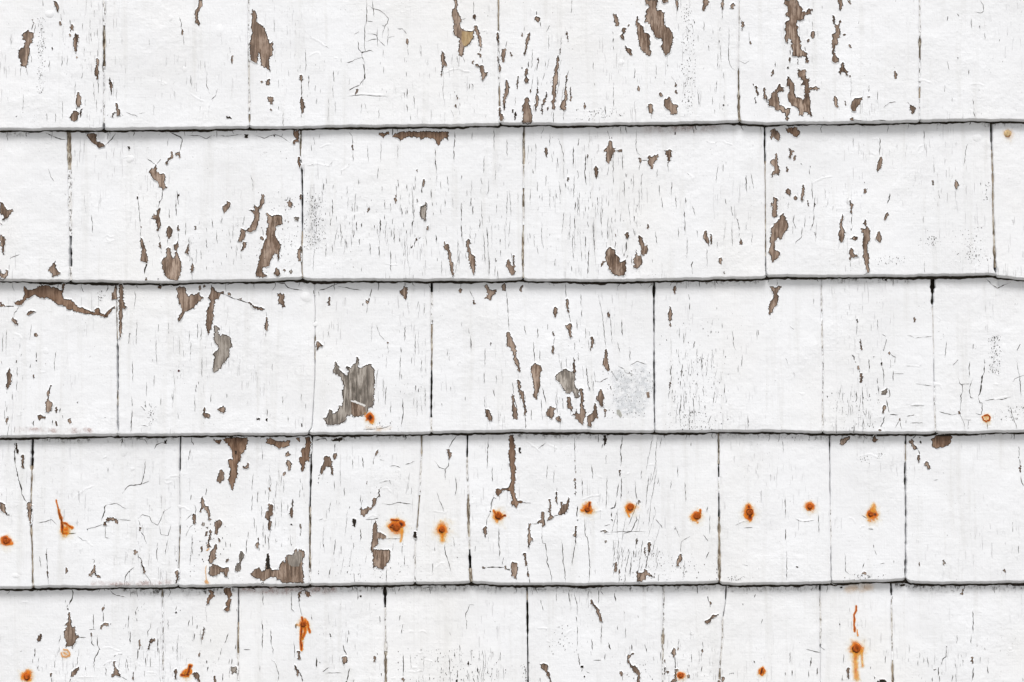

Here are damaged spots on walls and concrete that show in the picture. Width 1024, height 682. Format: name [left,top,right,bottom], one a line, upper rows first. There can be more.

peeling [612,0,680,57]
peeling [0,261,131,340]
peeling [136,159,269,373]
peeling [237,193,302,278]
peeling [323,356,377,427]
rust [55,499,74,537]
peeling [186,423,338,613]
rust [387,518,405,542]
rust [744,503,754,522]
rust [866,504,879,522]
rust [297,616,311,651]
rust [850,605,864,680]